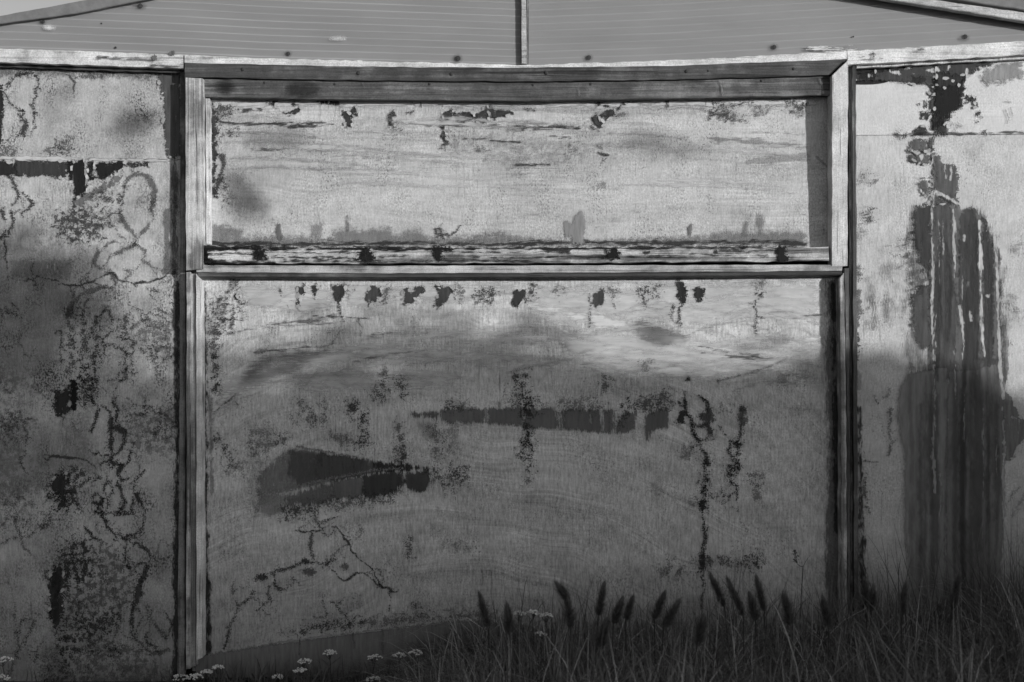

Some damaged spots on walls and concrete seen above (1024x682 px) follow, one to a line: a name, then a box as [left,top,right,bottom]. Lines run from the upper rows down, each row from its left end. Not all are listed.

crack [6,70,41,140]
peeling [384,105,536,140]
peeling [591,102,626,132]
peeling [905,65,982,207]
peeling [0,158,152,201]
peeling [332,281,545,322]
peeling [588,279,621,327]
peeling [636,279,706,326]
crack [0,169,174,658]
damp [898,156,1024,629]
damp [204,279,838,653]
crack [222,510,397,649]